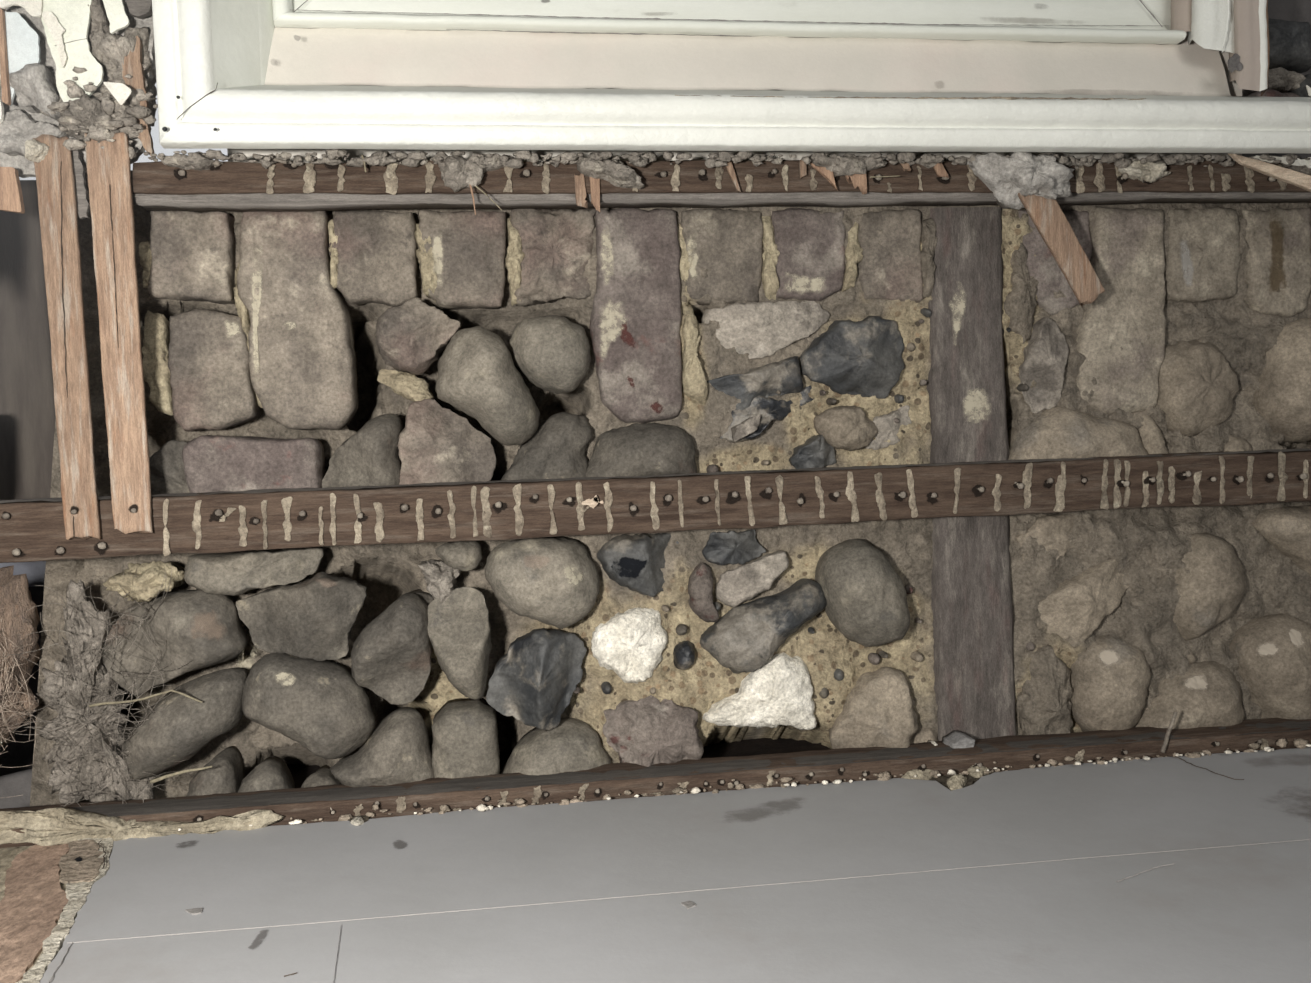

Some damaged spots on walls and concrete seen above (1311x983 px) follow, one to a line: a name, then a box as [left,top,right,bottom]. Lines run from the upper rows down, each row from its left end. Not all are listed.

peeling [1228,53,1243,73]
crack [48,839,1311,983]